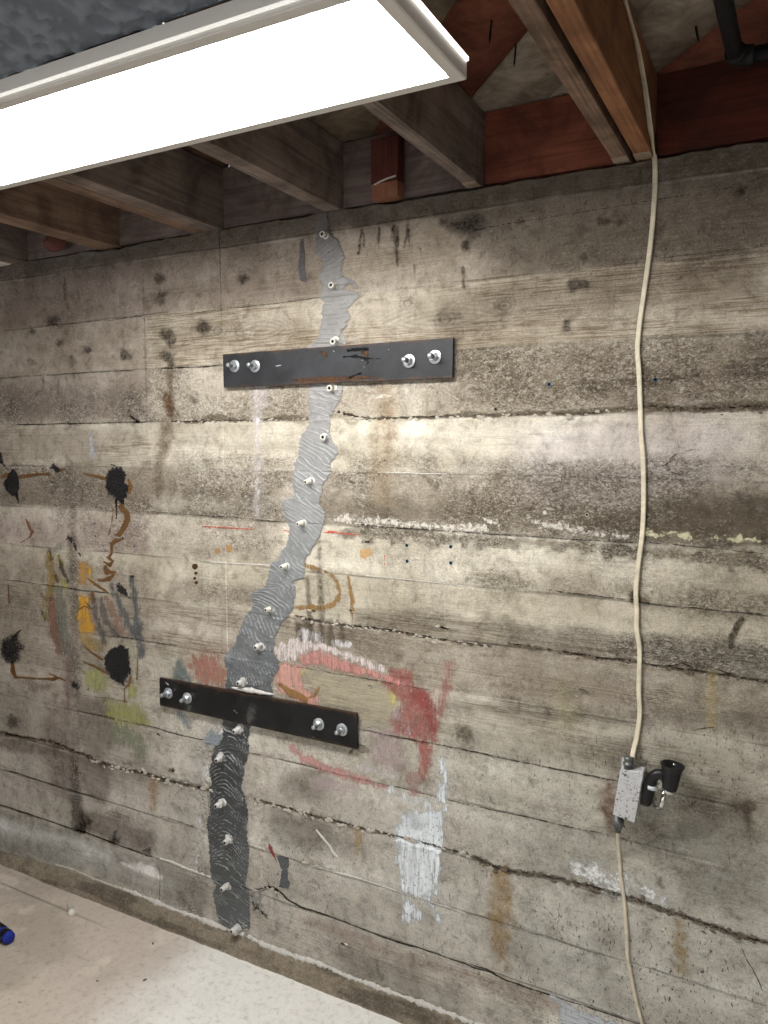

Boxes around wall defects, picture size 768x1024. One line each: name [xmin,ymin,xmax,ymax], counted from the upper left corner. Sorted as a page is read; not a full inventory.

crack [242,885,637,1024]
crack [264,801,767,989]